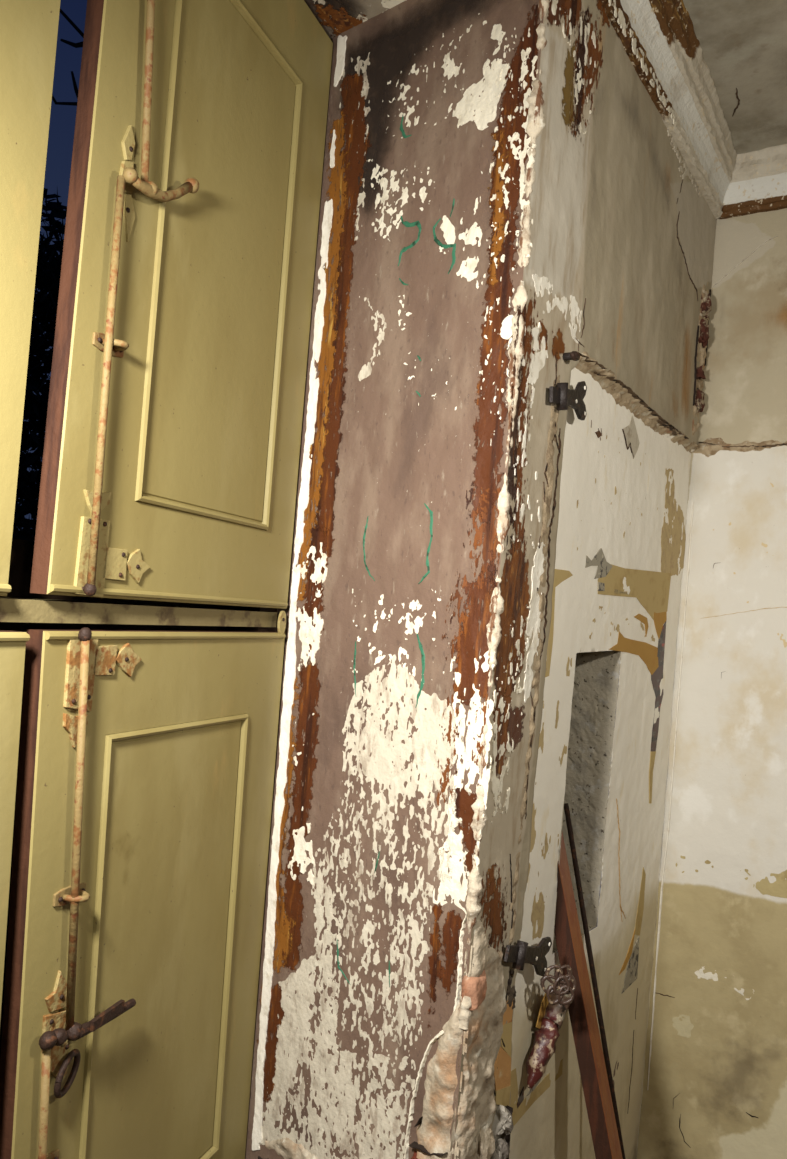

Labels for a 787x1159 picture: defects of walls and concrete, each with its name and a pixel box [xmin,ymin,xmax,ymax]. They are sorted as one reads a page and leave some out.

corrosion [256,73,372,1105]
peeling [252,0,787,1159]
corrosion [434,0,610,953]
crack [676,179,698,301]